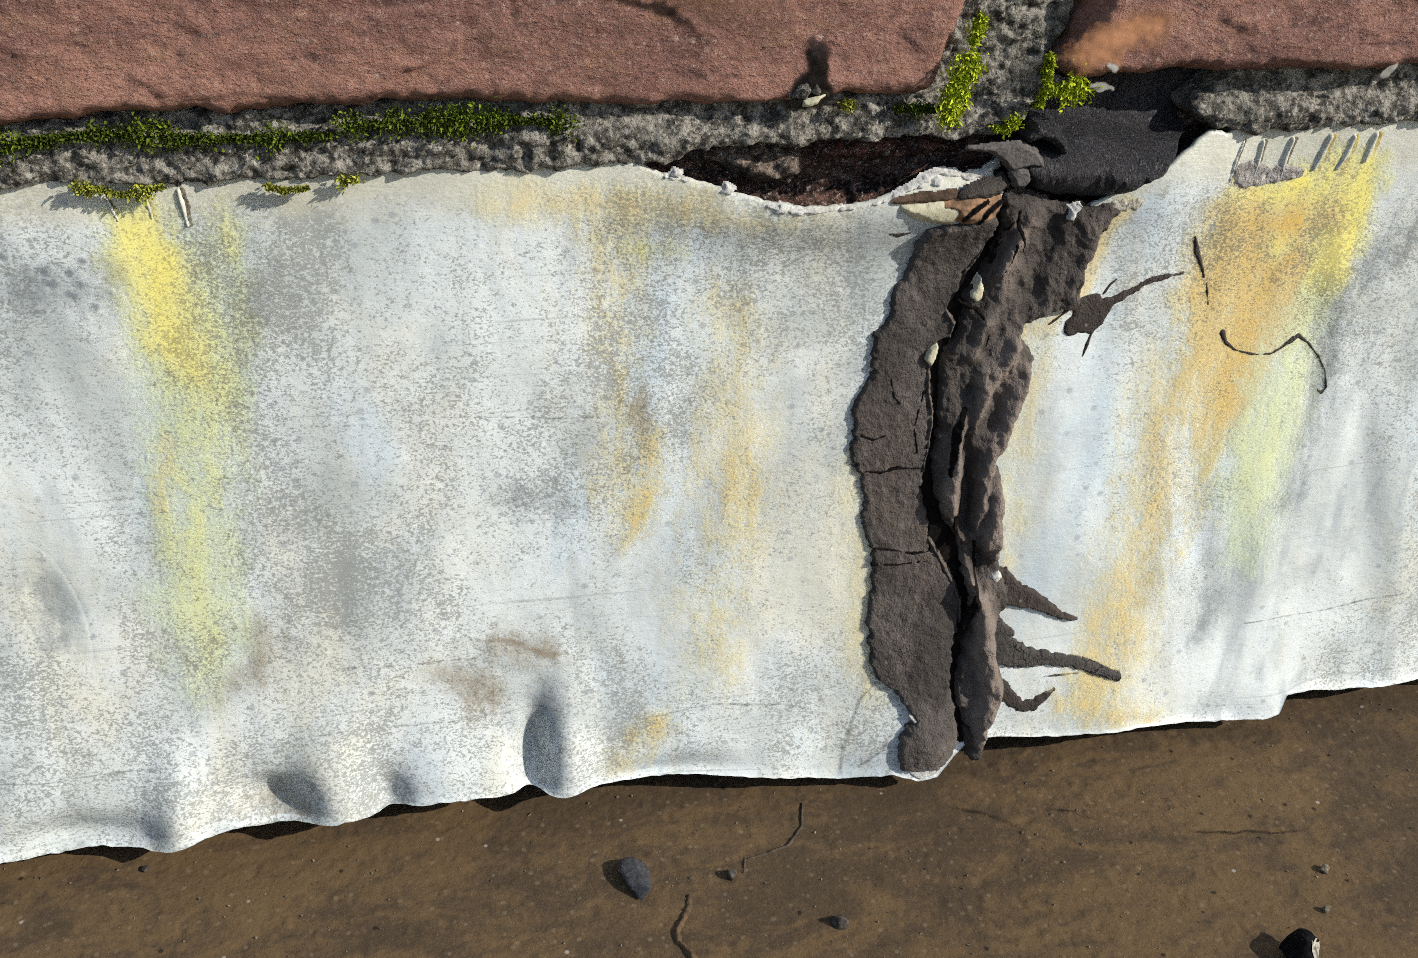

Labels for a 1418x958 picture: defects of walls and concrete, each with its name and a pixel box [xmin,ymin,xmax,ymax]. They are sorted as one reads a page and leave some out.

crack [618,0,701,37]
spalling [669,135,1044,225]
peeling [1066,201,1083,221]
spalling [970,272,984,302]
spalling [924,343,938,366]